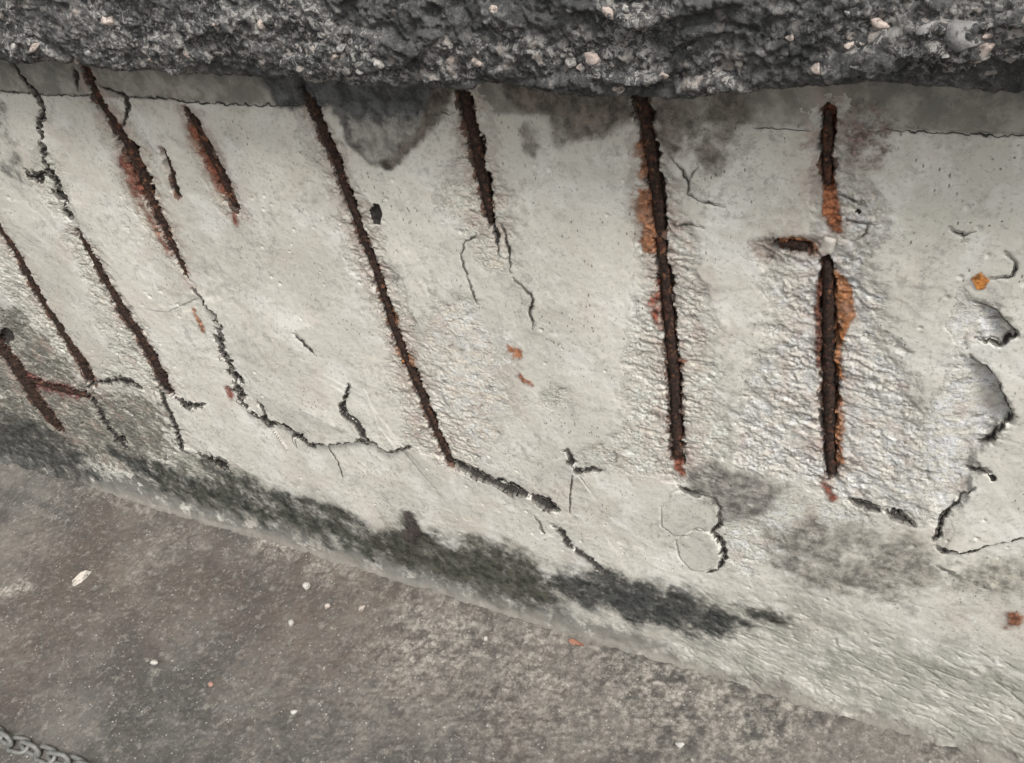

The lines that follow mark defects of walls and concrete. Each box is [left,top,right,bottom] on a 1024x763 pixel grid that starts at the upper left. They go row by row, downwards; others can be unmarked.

water stain [262,76,451,169]
rust [118,155,172,256]
rust [635,138,657,253]
rust [822,173,843,233]
crack [460,212,534,327]
crack [192,290,410,477]
spalling [573,86,1016,580]
rust [814,269,856,464]
crack [970,302,1017,442]
water stain [0,412,99,483]
water stain [107,445,789,639]
crack [678,486,728,573]